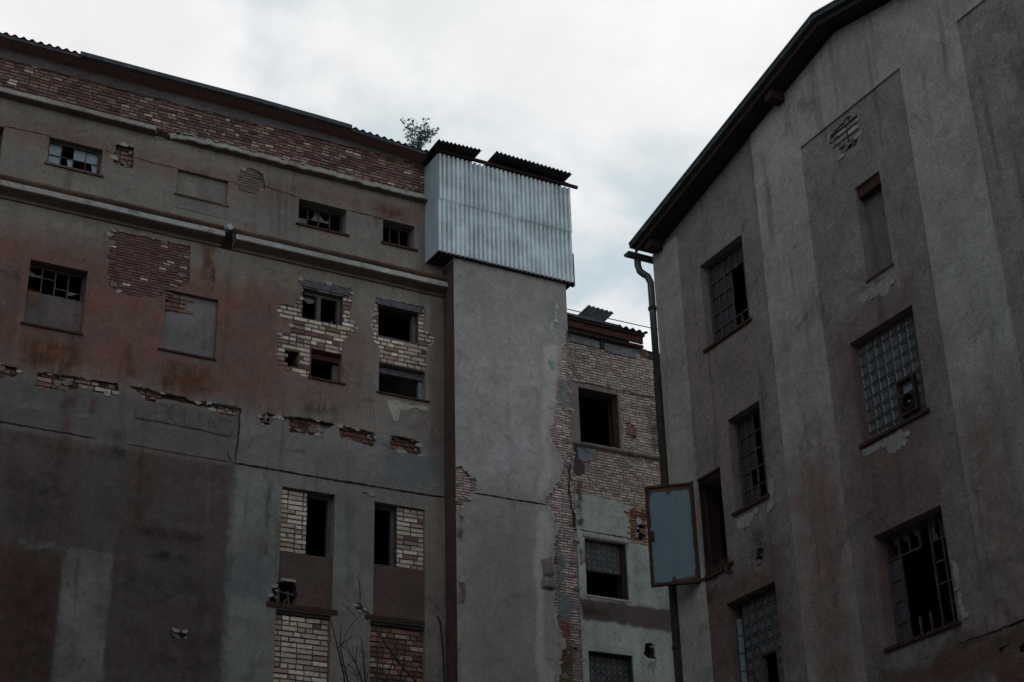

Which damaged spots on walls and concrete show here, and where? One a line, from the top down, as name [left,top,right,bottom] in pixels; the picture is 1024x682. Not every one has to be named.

spalling [826,114,863,161]
spalling [238,167,265,194]
spalling [106,229,194,315]
spalling [274,277,434,376]
spalling [35,374,241,416]
spalling [256,413,423,457]
peeling [862,429,911,456]
spalling [454,467,478,511]
spalling [545,301,598,682]